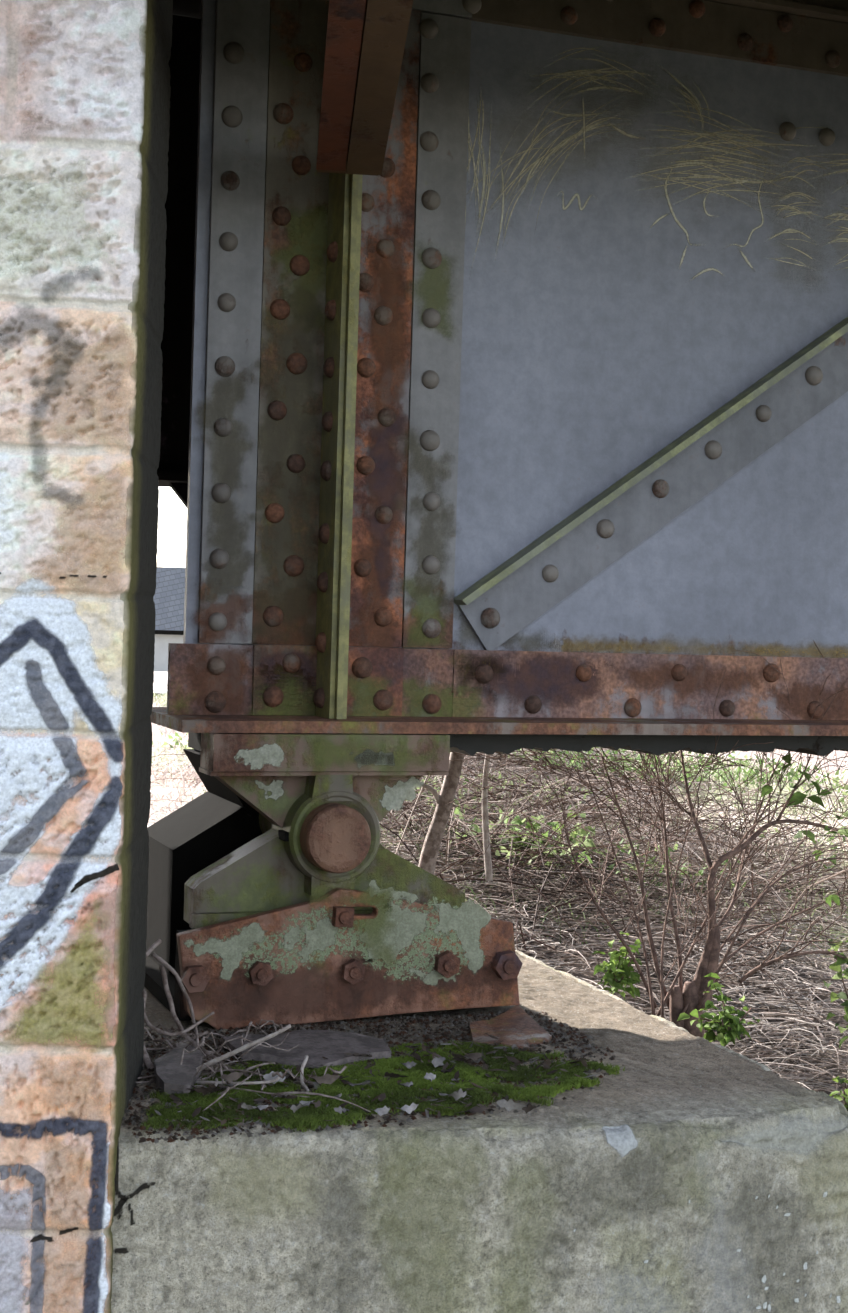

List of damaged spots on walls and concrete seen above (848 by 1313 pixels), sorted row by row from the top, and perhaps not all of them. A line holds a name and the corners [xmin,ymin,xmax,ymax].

rust [198,589,317,689]
rust [459,654,598,704]
rust [629,664,752,695]
peeling [234,744,284,800]
peeling [350,750,424,811]
peeling [184,922,267,981]
peeling [281,918,338,970]
peeling [359,880,491,985]